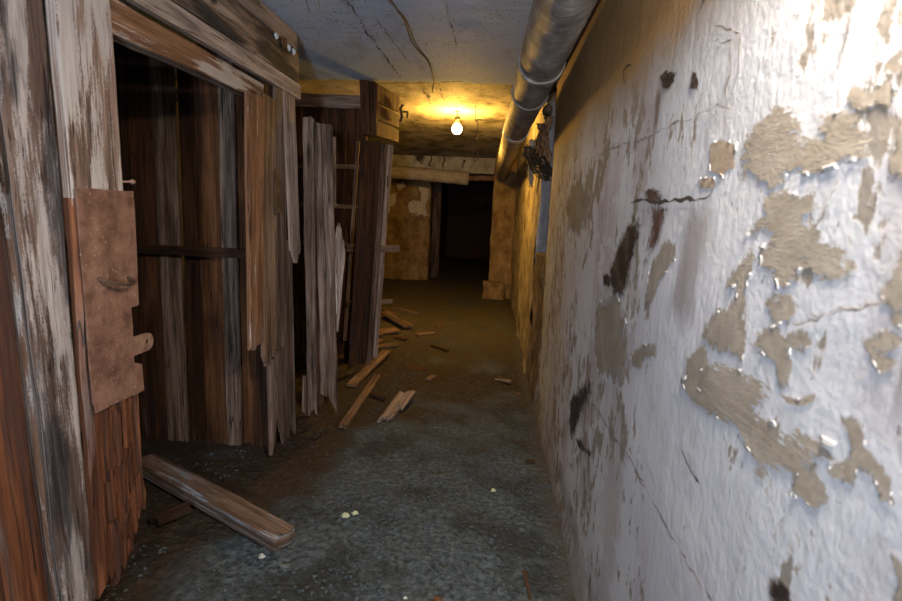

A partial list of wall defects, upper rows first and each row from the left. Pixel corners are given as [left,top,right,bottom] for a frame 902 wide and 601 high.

crack [348,2,483,105]
crack [600,24,741,155]
peeling [680,59,902,510]
crack [794,302,885,326]
crack [589,398,713,601]